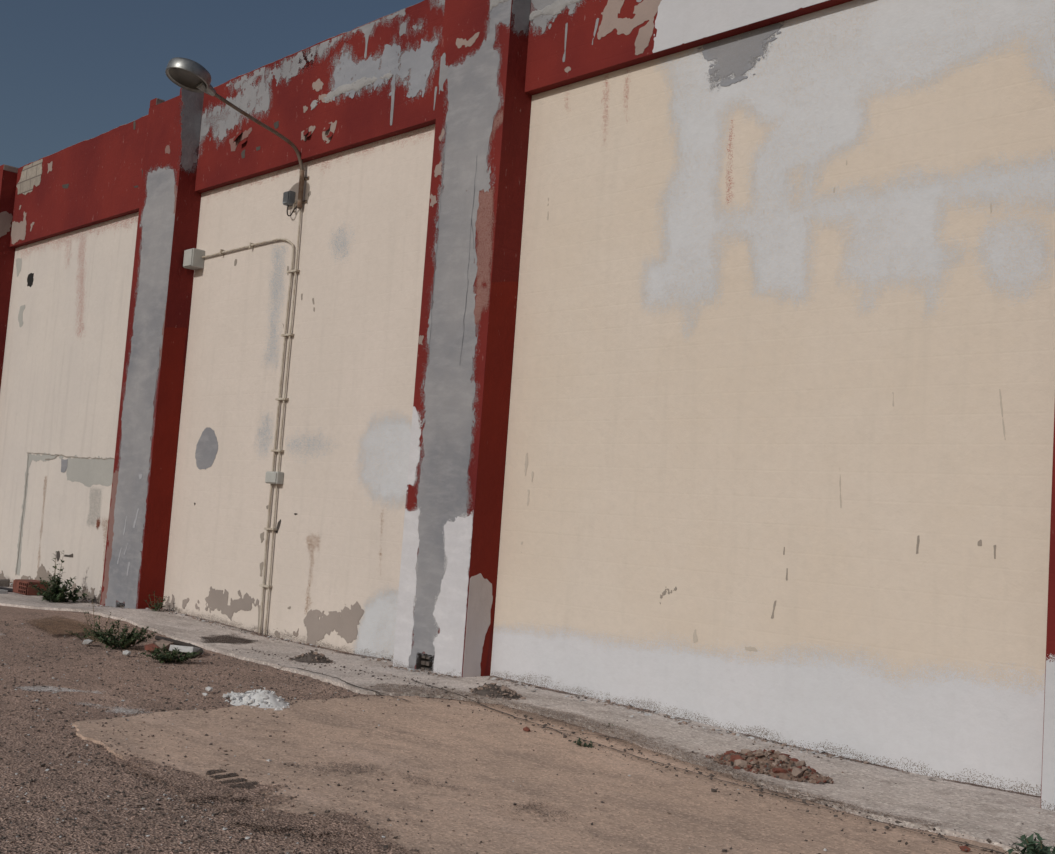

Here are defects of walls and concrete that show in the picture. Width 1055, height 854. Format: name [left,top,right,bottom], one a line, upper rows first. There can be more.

peeling [302,0,445,68]
peeling [456,32,480,48]
peeling [597,0,662,55]
peeling [303,79,333,113]
peeling [301,121,337,143]
spalling [0,159,53,245]
peeling [16,258,34,287]
peeling [473,186,496,328]
peeling [407,406,422,490]
peeling [0,453,118,605]
spalling [163,586,261,632]
spalling [274,601,364,646]